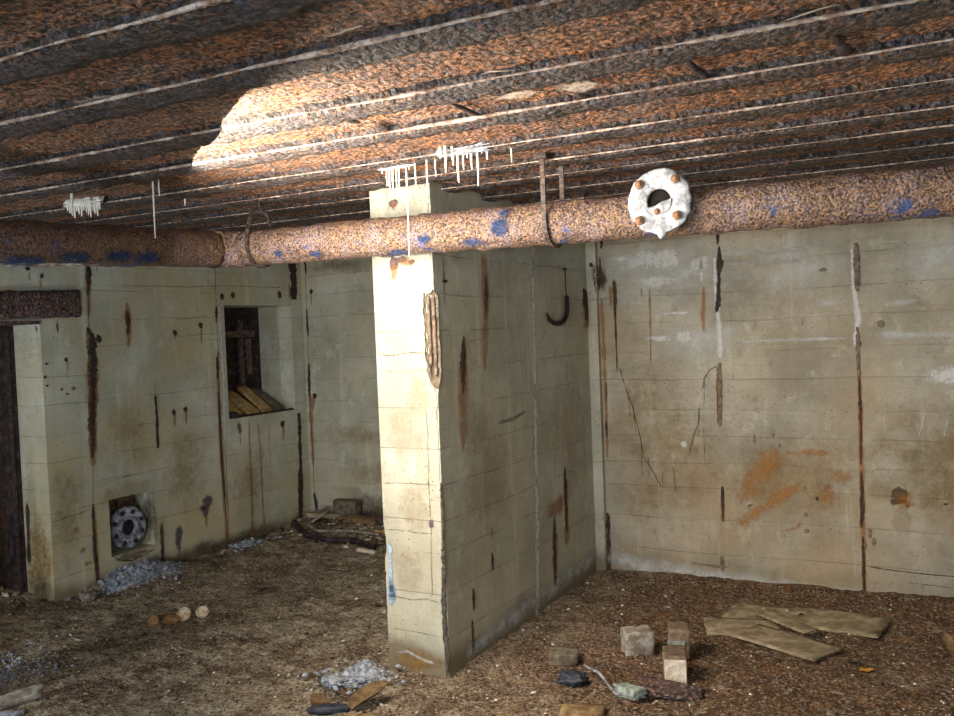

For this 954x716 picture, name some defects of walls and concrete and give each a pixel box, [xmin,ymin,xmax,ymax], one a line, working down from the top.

water stain [0,0,954,206]
water stain [70,105,954,231]
rust [389,256,415,270]
spalling [422,290,441,389]
rust [459,336,467,393]
crack [620,370,676,492]